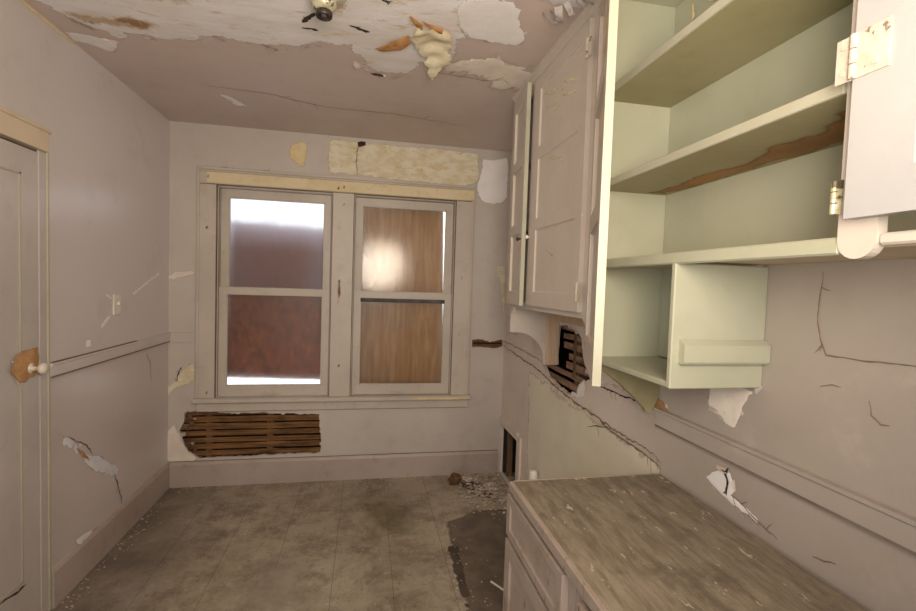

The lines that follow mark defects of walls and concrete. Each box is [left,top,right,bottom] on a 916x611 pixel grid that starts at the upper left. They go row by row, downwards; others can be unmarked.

flaking render [542,0,595,24]
peeling [21,0,534,92]
peeling [327,137,508,204]
crack [816,280,916,367]
spalling [59,433,118,476]
spalling [168,410,321,463]
crack [503,341,661,469]
peeling [527,325,660,480]
peeling [706,386,763,428]
spalling [706,465,763,528]